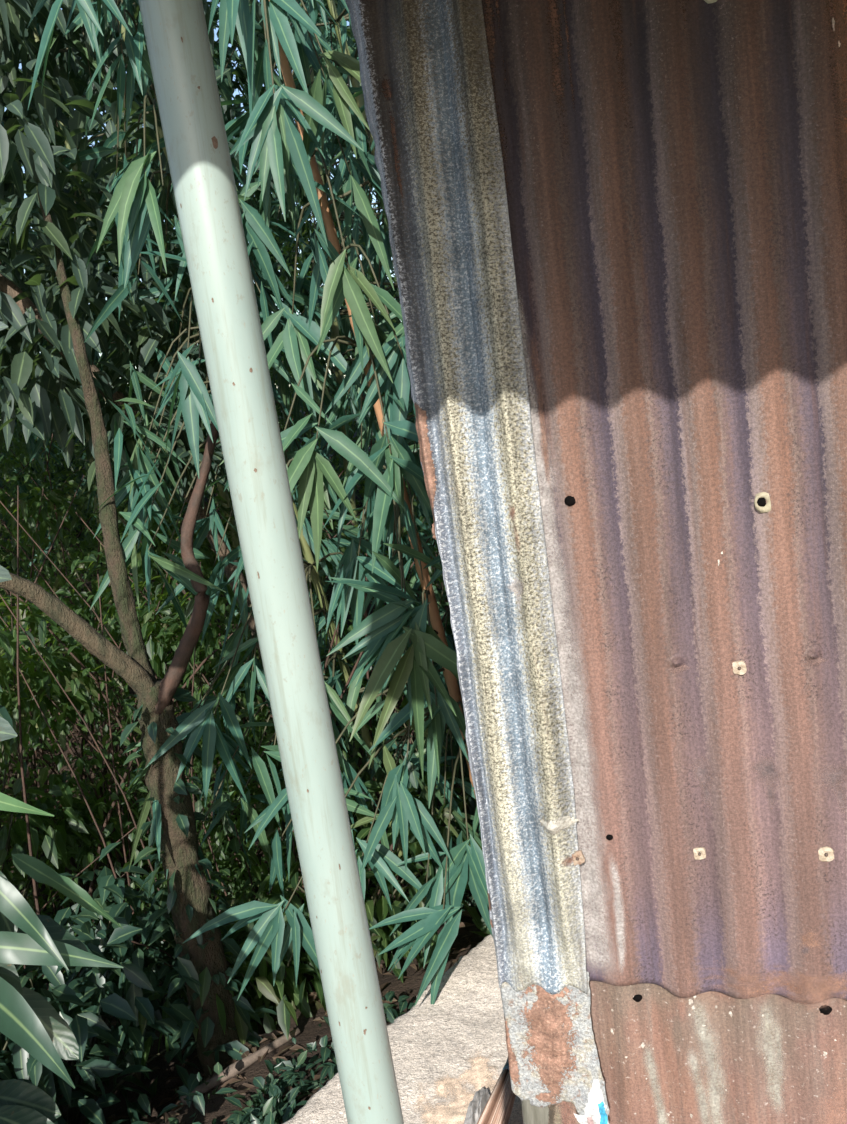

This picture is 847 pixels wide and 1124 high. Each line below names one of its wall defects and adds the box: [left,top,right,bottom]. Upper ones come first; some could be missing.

corrosion [483,0,511,201]
corrosion [518,300,624,965]
corrosion [413,984,584,1124]
water stain [645,1049,667,1124]
water stain [689,1006,724,1124]
water stain [761,1007,782,1105]